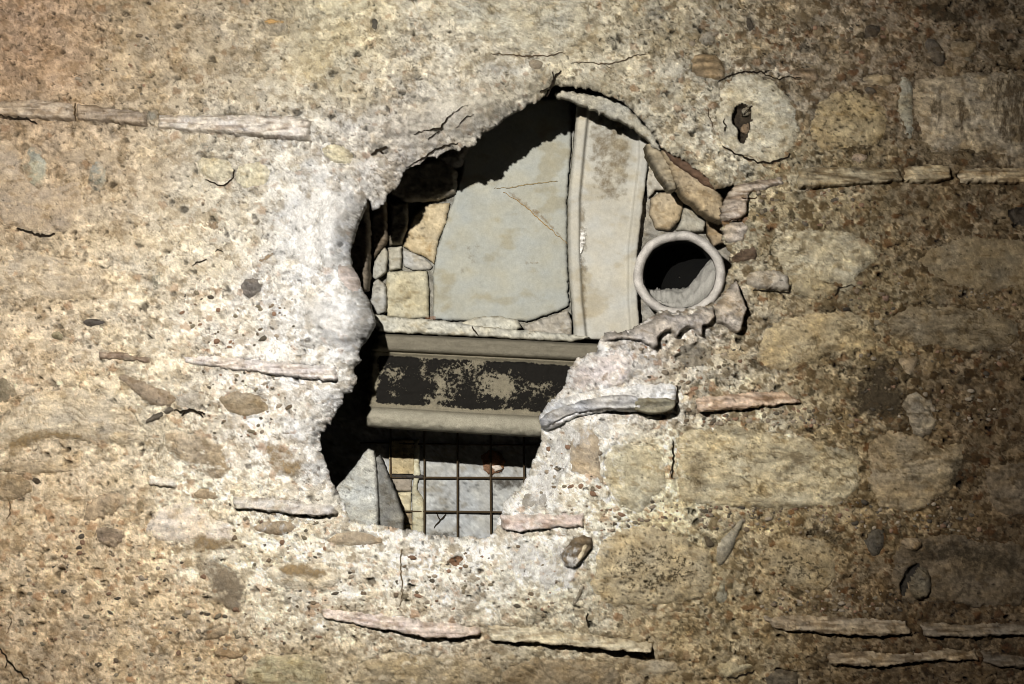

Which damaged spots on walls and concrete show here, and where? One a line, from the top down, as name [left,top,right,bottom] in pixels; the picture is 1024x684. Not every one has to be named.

crack [491,52,645,97]
crack [408,105,474,167]
spalling [732,103,753,144]
spalling [643,143,784,263]
spalling [338,264,361,292]
spalling [677,342,711,368]
spalling [481,450,505,475]
crack [668,440,676,478]